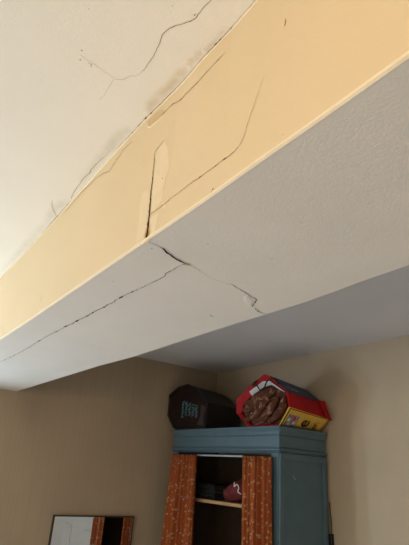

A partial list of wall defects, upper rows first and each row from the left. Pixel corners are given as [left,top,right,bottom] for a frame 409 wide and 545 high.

crack [7,77,264,359]
crack [47,0,253,228]